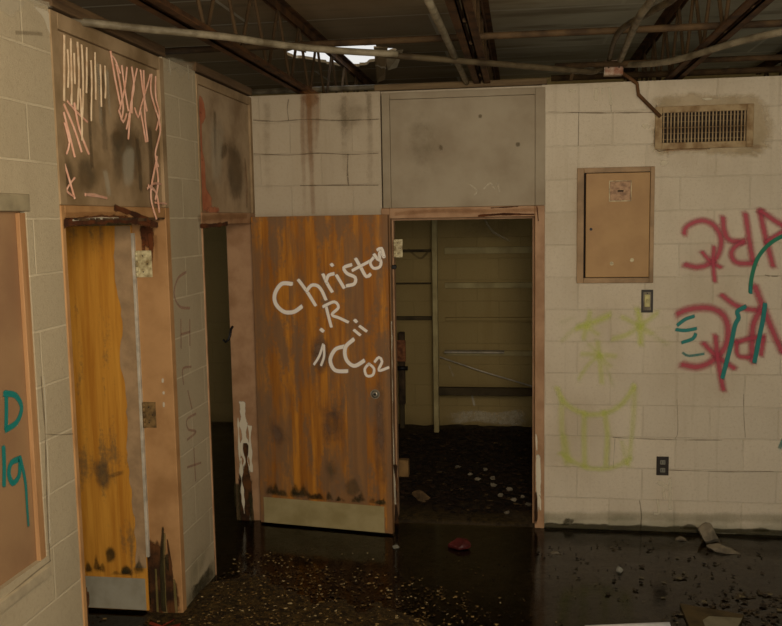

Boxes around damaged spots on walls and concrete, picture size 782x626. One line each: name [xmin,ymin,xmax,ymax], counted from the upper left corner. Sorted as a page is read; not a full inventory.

rust [64,204,158,259]